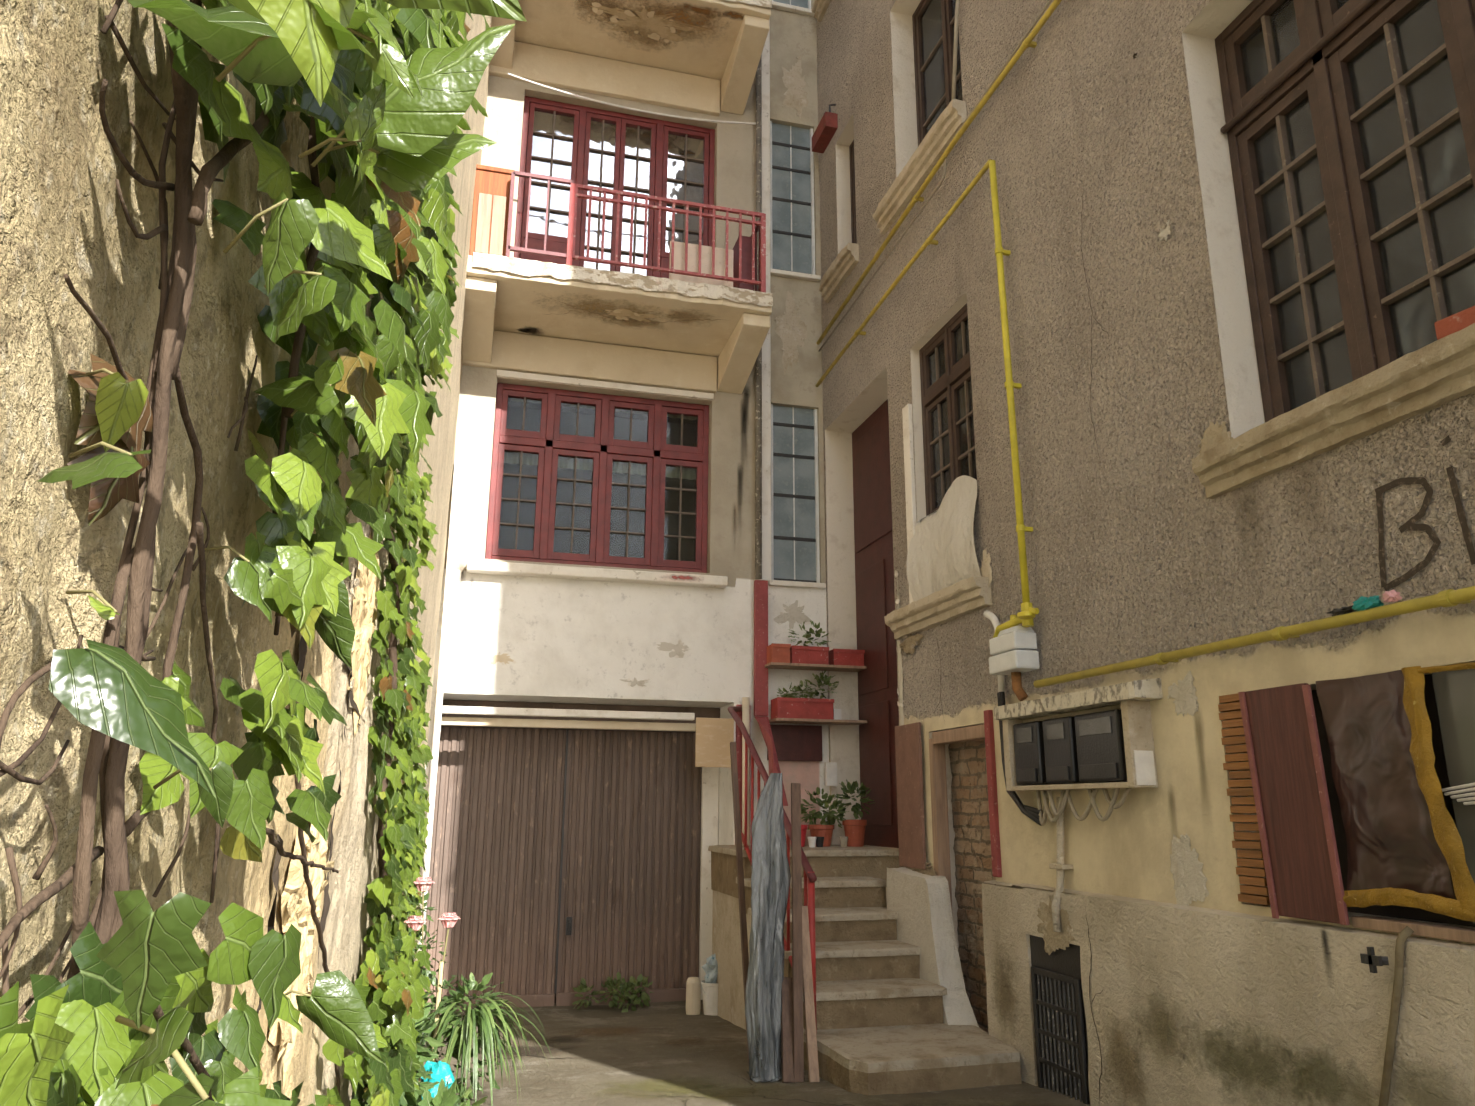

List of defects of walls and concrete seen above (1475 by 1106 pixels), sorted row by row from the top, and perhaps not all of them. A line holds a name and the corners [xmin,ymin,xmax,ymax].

peeling [584,2,713,43]
spalling [346,528,383,738]
spalling [268,824,335,1101]